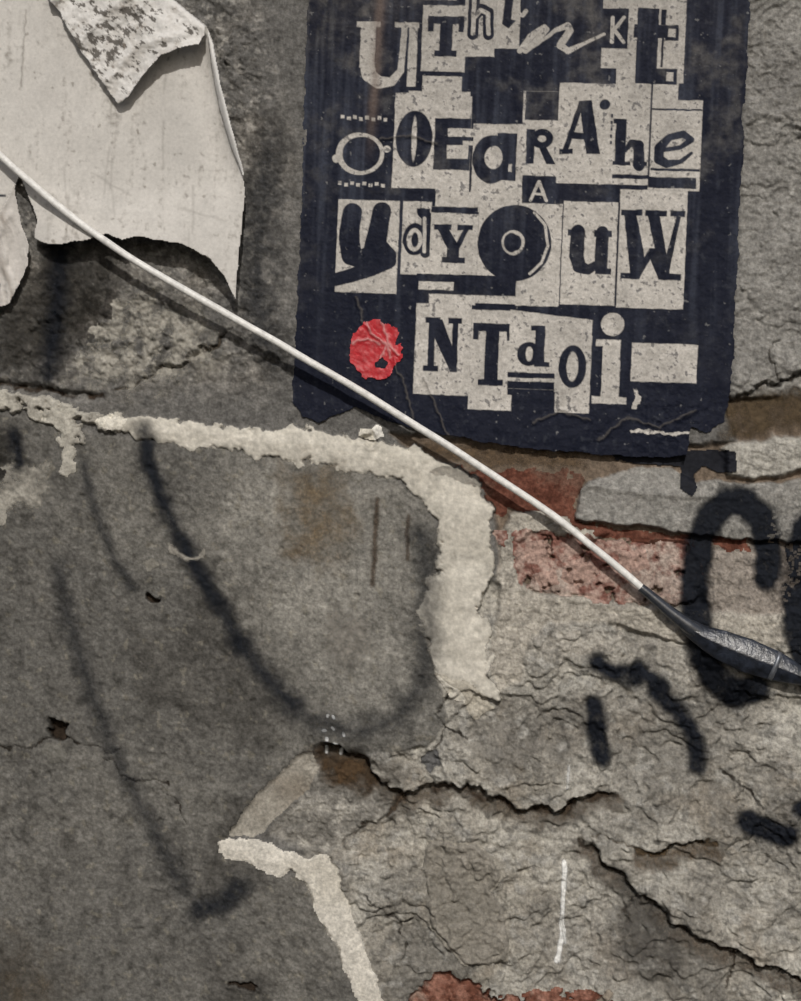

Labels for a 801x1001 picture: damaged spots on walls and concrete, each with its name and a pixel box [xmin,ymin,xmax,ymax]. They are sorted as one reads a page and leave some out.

peeling [372,425,384,440]
spalling [454,464,688,607]
spalling [713,536,751,552]
crack [1,735,110,761]
crack [315,743,407,834]
spalling [375,781,622,827]
crack [431,783,619,816]
crack [722,771,759,805]
spalling [218,745,384,1001]
crack [365,895,414,958]
crack [578,836,801,984]
spalling [408,971,613,1001]